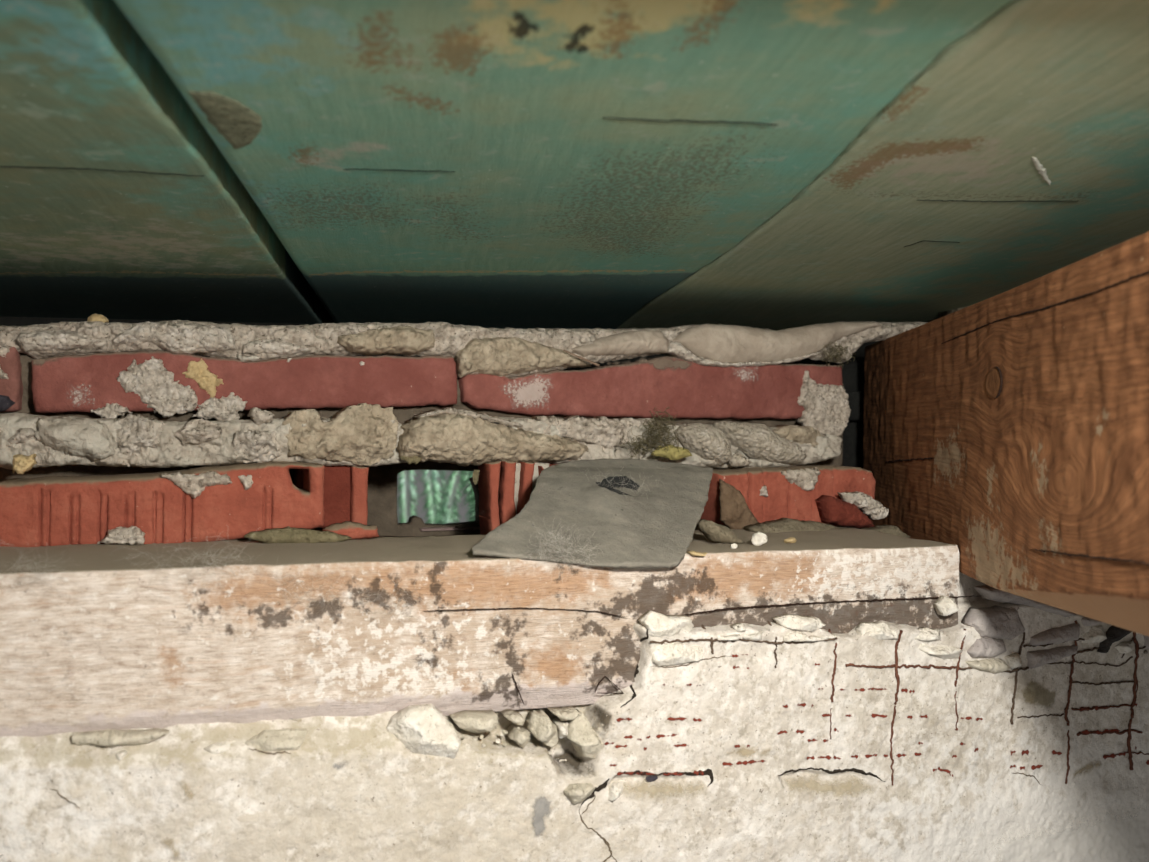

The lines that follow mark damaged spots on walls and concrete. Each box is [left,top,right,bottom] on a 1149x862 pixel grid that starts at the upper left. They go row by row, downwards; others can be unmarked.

crack [0,166,202,176]
flaking render [593,706,612,729]
corrosion [604,717,702,751]
corrosion [610,764,704,776]
flaking render [616,769,714,796]
corrosion [722,745,764,766]
flaking render [778,767,886,796]
corrosion [778,703,923,760]
corrosion [933,717,983,777]
crack [579,778,617,862]